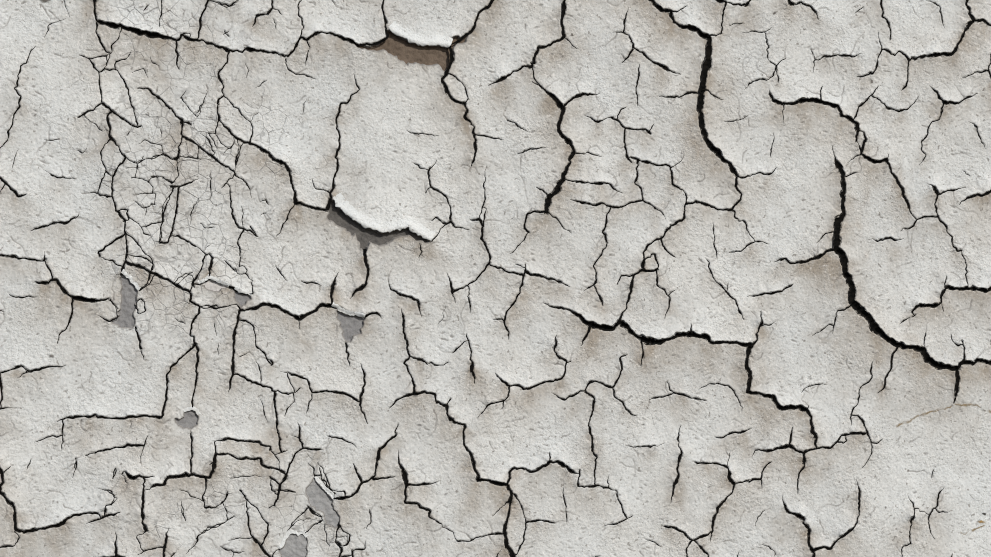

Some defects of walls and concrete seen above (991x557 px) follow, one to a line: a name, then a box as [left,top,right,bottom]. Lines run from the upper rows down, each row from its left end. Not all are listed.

peeling [360,21,466,71]
peeling [327,192,435,250]
crack [0,0,636,557]
crack [414,0,991,557]
peeling [306,476,339,527]
peeling [277,530,308,557]